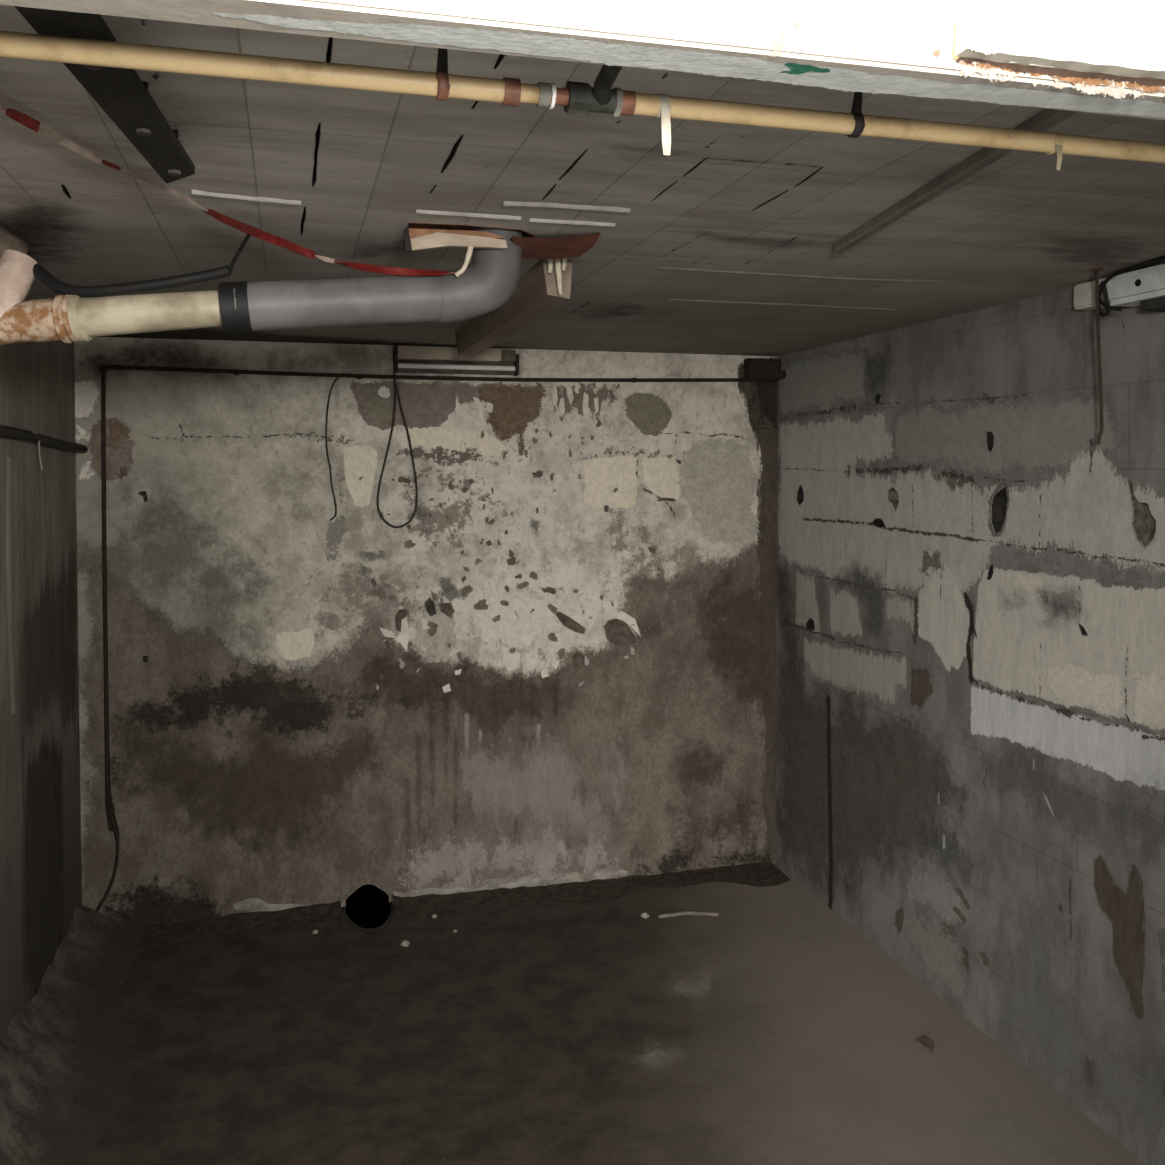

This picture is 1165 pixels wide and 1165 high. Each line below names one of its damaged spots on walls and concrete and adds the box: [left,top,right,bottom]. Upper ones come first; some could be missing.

peeling [956,44,1144,99]
peeling [350,380,496,431]
peeling [551,382,620,457]
spalling [986,431,994,453]
spalling [888,488,899,511]
spalling [988,482,1010,537]
spalling [1128,479,1157,549]
peeling [371,487,591,693]
flaking render [599,592,641,662]
peeling [916,563,972,673]
leakage [20,361,965,995]
leakage [1093,856,1165,1020]